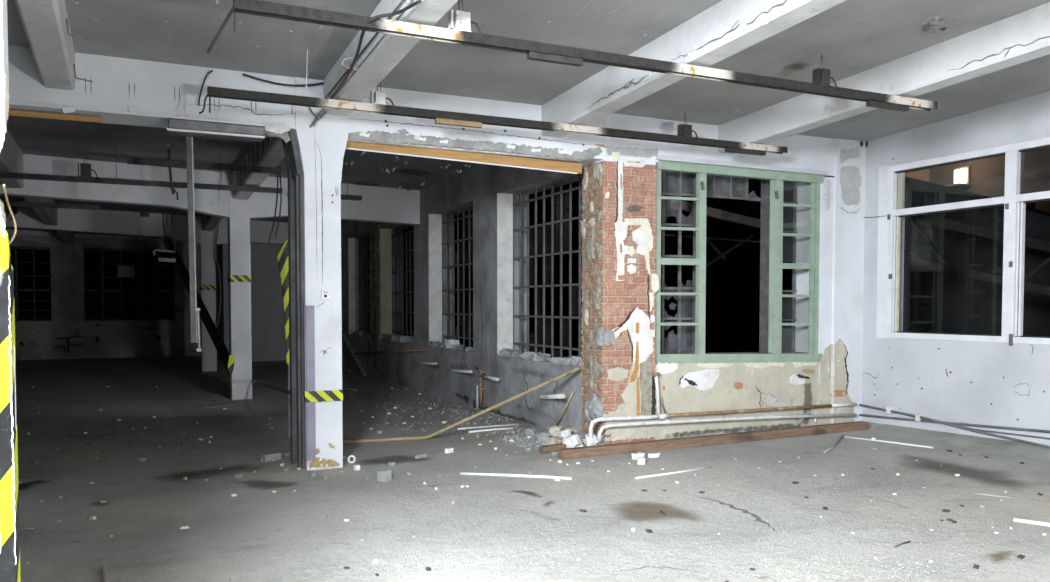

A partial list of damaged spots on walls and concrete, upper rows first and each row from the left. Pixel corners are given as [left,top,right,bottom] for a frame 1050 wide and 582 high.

crack [588,0,787,108]
crack [948,36,1050,71]
flaking render [0,74,8,151]
flaking render [262,122,291,143]
flaking render [343,129,603,191]
flaking render [803,339,855,425]
peeling [8,276,24,564]
peeling [308,444,339,469]
leakage [621,504,689,519]
crack [690,495,775,531]